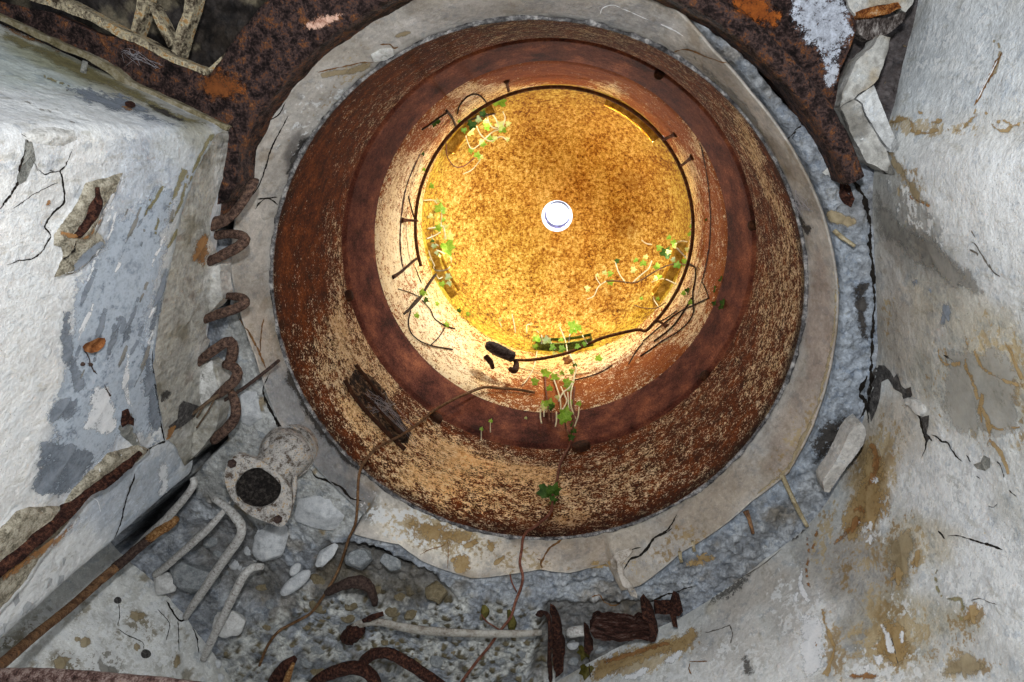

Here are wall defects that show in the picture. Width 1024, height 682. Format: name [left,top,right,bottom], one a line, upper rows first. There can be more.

rust [306,14,341,30]
crack [0,134,76,265]
spalling [54,173,123,277]
spalling [203,292,250,324]
crack [841,182,876,475]
crack [902,396,1016,507]
crack [624,515,677,569]
leakage [885,529,920,587]
crack [938,531,1002,550]
leakage [934,571,979,624]
leakage [849,619,910,680]
leakage [944,653,984,678]